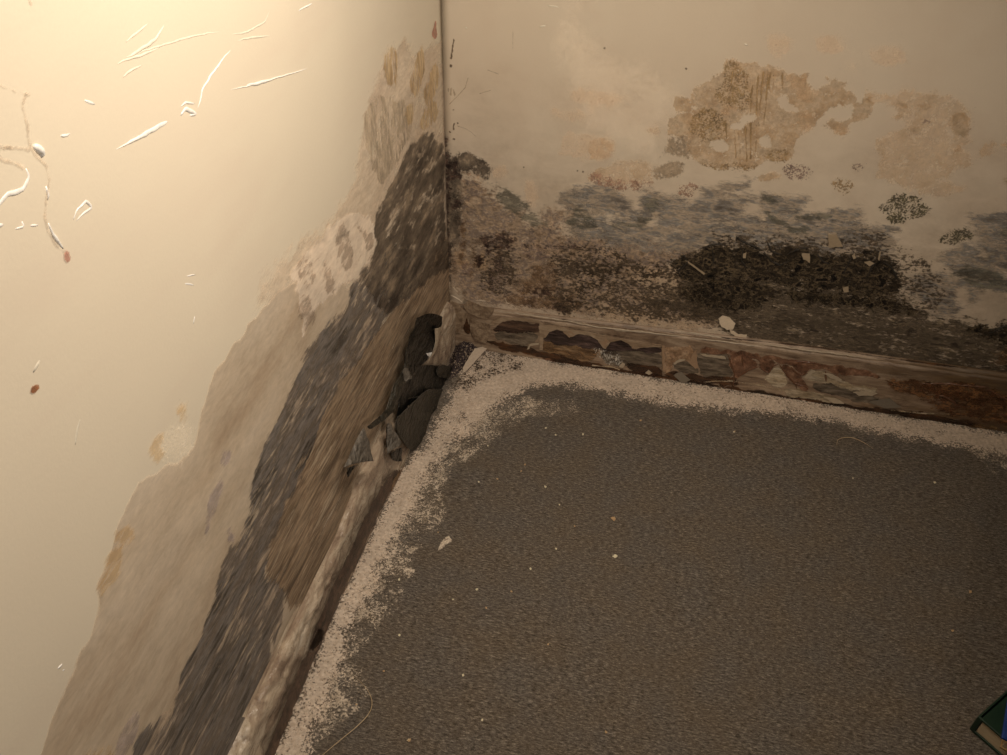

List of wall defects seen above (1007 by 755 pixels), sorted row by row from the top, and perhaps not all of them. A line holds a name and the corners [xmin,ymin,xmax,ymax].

crack [0,144,70,261]
peeling [449,282,739,388]
peeling [719,315,747,337]
peeling [765,367,901,408]
water stain [42,132,1007,755]